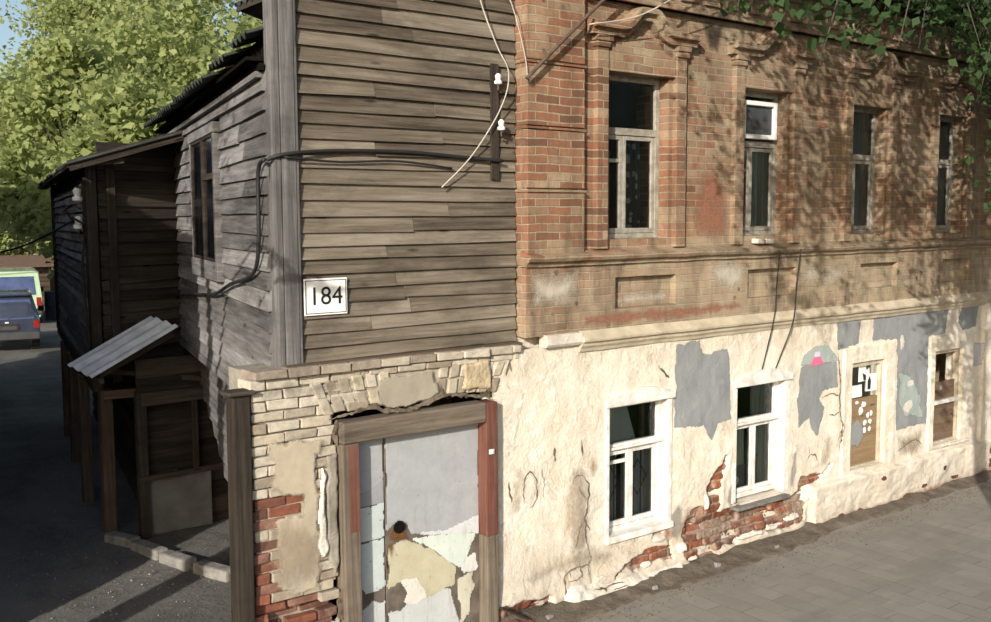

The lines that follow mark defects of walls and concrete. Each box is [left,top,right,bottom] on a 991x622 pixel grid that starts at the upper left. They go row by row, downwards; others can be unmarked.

flaking render [462,360,492,391]
flaking render [269,439,329,595]
crack [508,448,556,507]
crack [563,440,629,595]
flaking render [615,457,820,577]